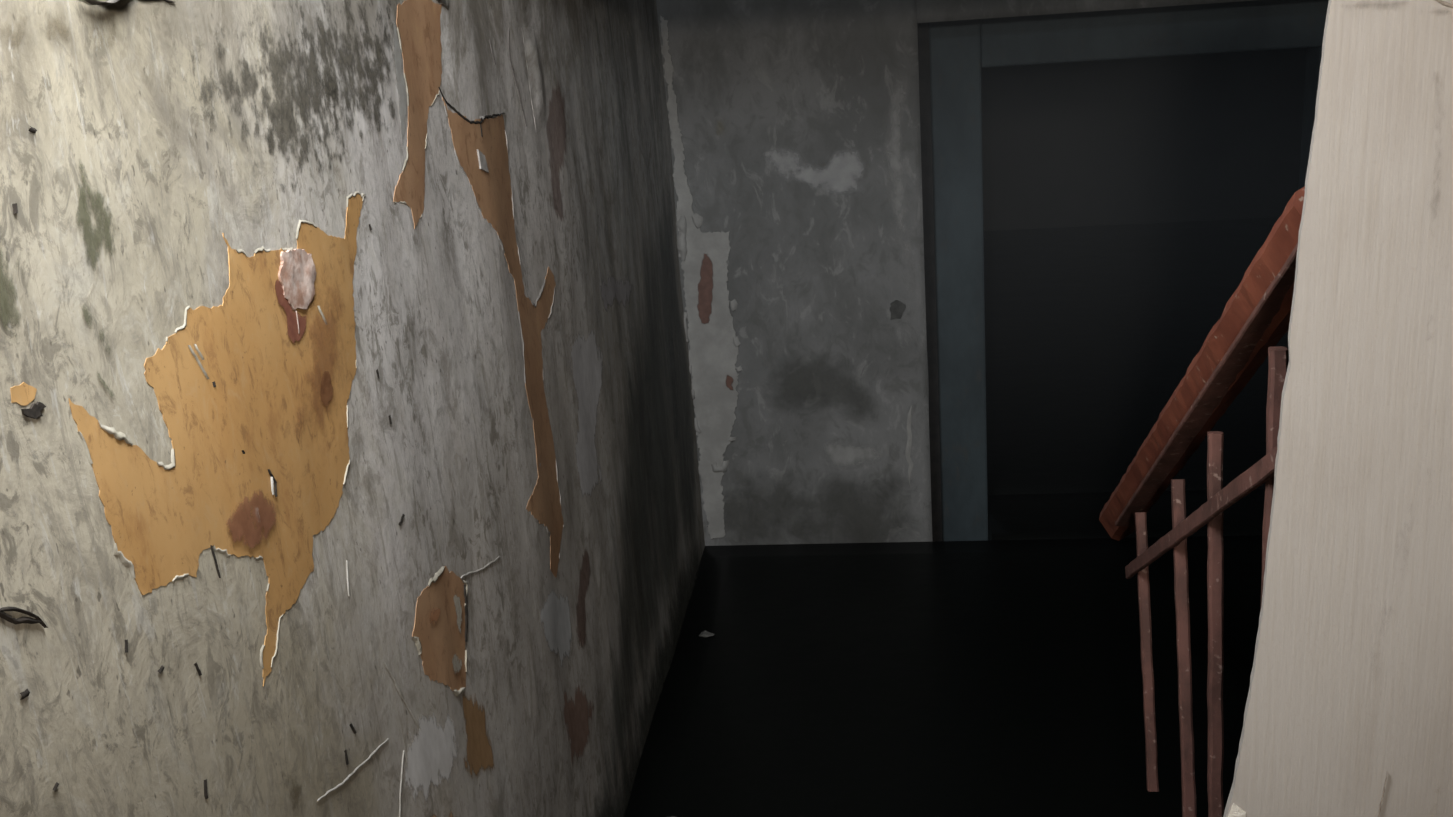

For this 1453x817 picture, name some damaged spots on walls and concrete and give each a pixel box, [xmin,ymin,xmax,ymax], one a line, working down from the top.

water stain [201,0,395,190]
peeling [68,191,372,686]
peeling [393,0,564,578]
flaking render [570,331,603,497]
crack [0,607,48,628]
peeling [405,566,494,817]